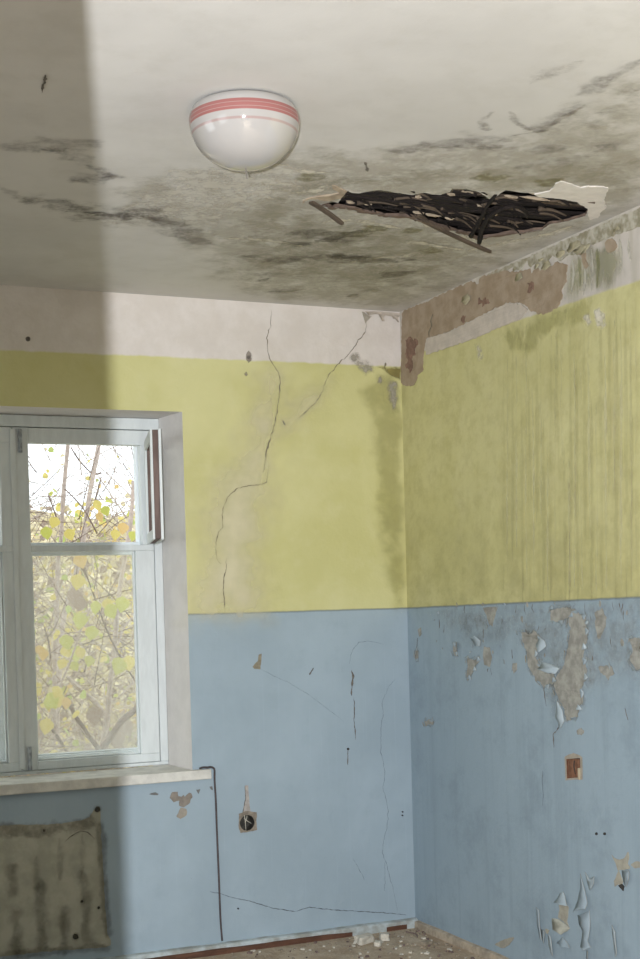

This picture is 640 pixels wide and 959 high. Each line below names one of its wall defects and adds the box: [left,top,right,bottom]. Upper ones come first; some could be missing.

water stain [134,164,332,225]
flaking render [351,180,640,407]
crack [216,312,366,608]
peeling [433,600,640,745]
peeling [170,786,213,819]
crack [212,750,405,915]
peeling [536,873,594,959]
peeling [612,852,640,891]